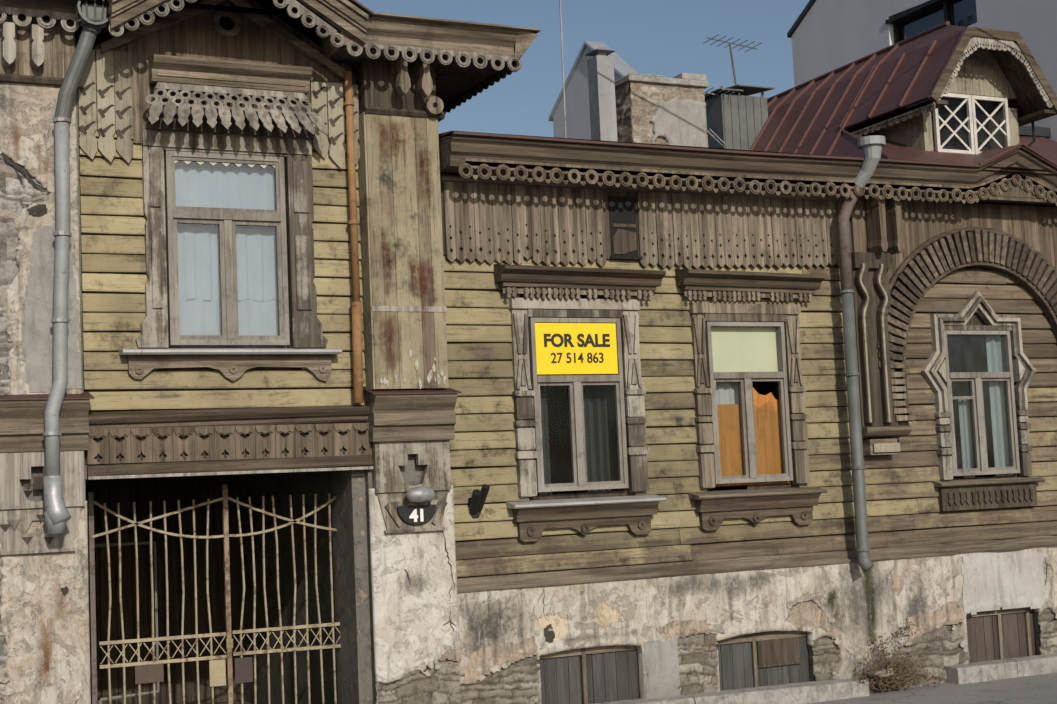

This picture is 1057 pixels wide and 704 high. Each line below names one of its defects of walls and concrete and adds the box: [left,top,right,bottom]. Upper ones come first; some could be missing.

spalling [0,151,56,393]
crack [442,530,456,631]
spalling [375,611,568,704]
spalling [656,615,725,695]
spalling [812,636,841,682]
spalling [894,601,970,686]
spalling [1037,603,1057,655]